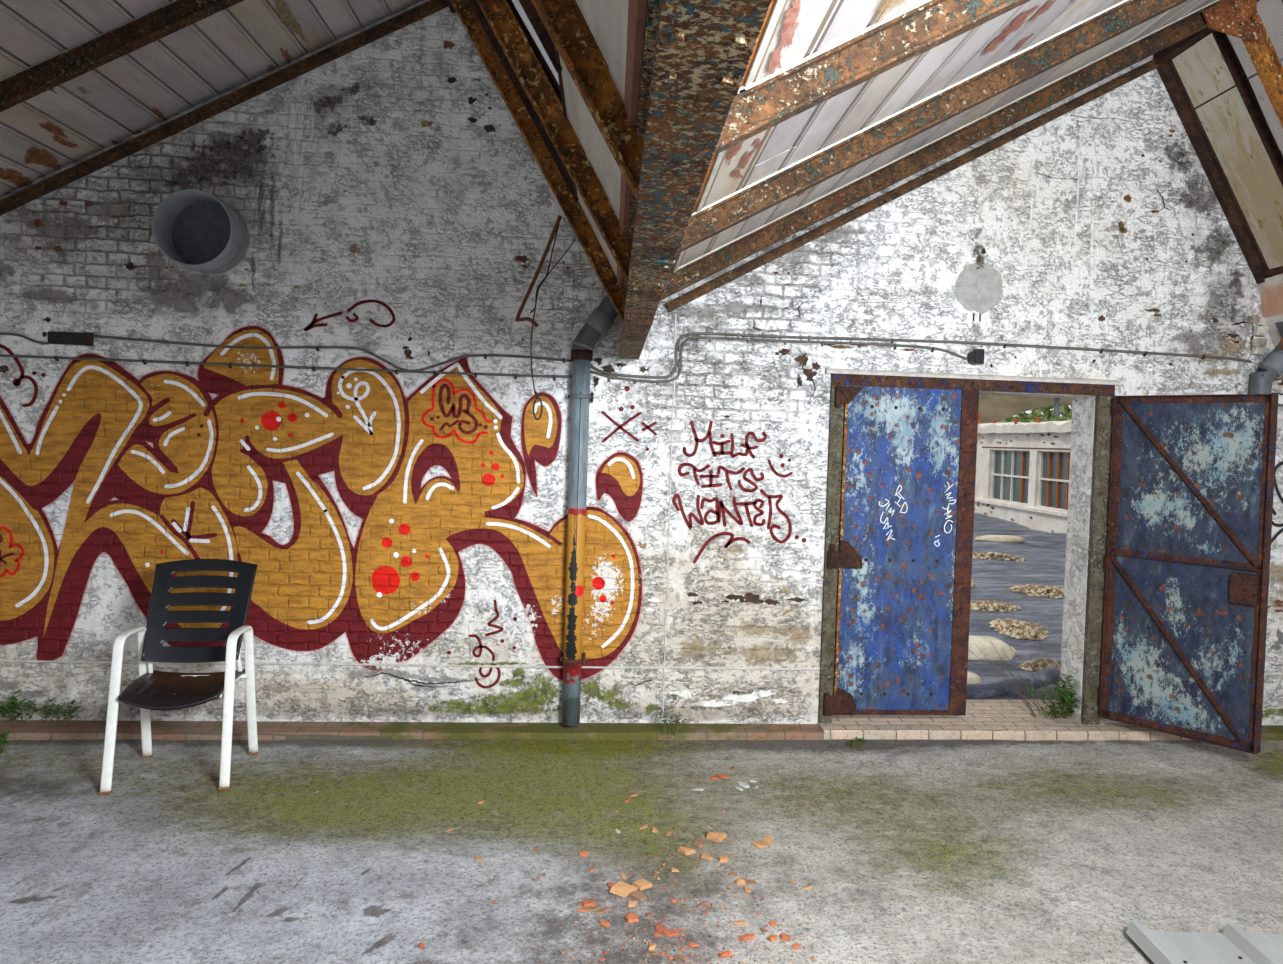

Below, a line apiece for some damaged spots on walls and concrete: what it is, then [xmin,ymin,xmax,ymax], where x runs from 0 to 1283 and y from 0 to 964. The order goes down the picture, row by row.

peeling [768,0,802,76]
peeling [0,122,78,195]
damp [164,83,376,264]
peeling [720,578,809,615]